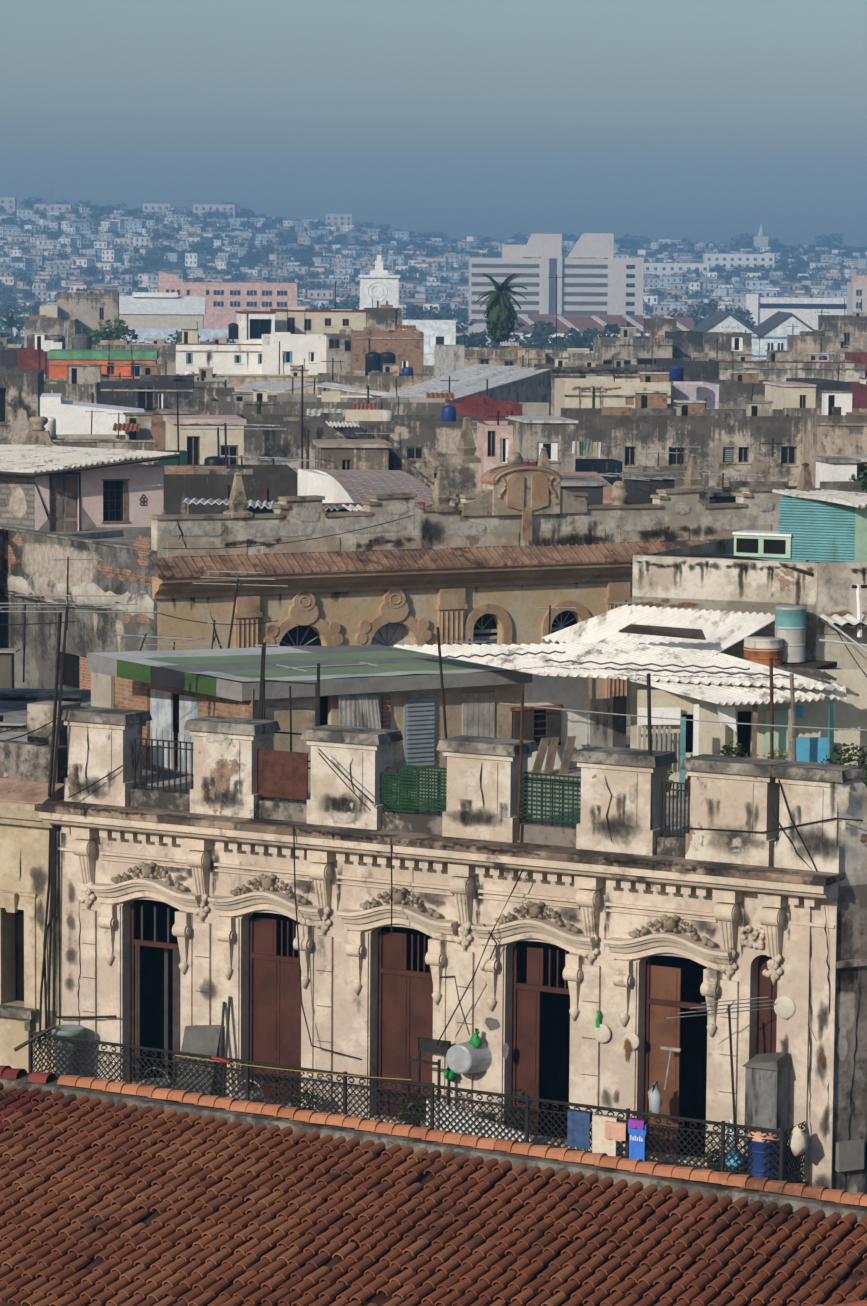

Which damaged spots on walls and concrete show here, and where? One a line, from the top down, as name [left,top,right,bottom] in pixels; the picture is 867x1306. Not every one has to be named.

water stain [638,561,812,605]
water stain [116,619,124,652]
water stain [201,778,241,806]
water stain [720,805,758,850]
water stain [789,806,839,857]